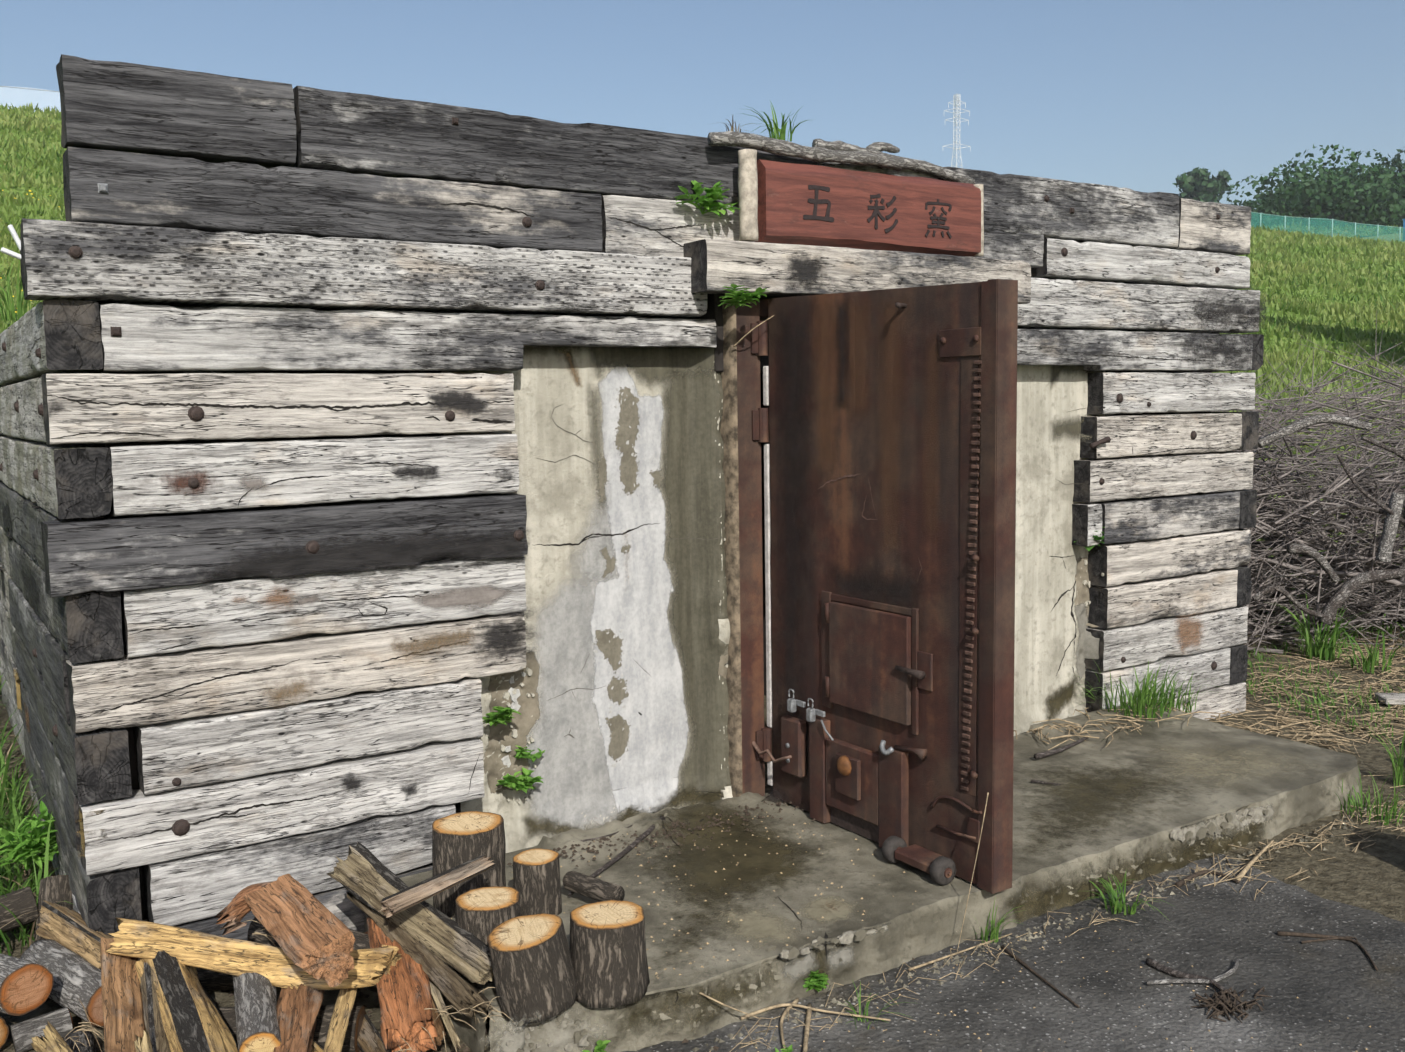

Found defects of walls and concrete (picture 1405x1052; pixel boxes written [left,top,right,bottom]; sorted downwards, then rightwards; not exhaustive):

peeling [595,385,663,508]
crack [537,523,657,546]
peeling [593,628,632,767]
damp [413,346,821,958]
damp [803,896,852,922]
damp [621,964,777,1030]